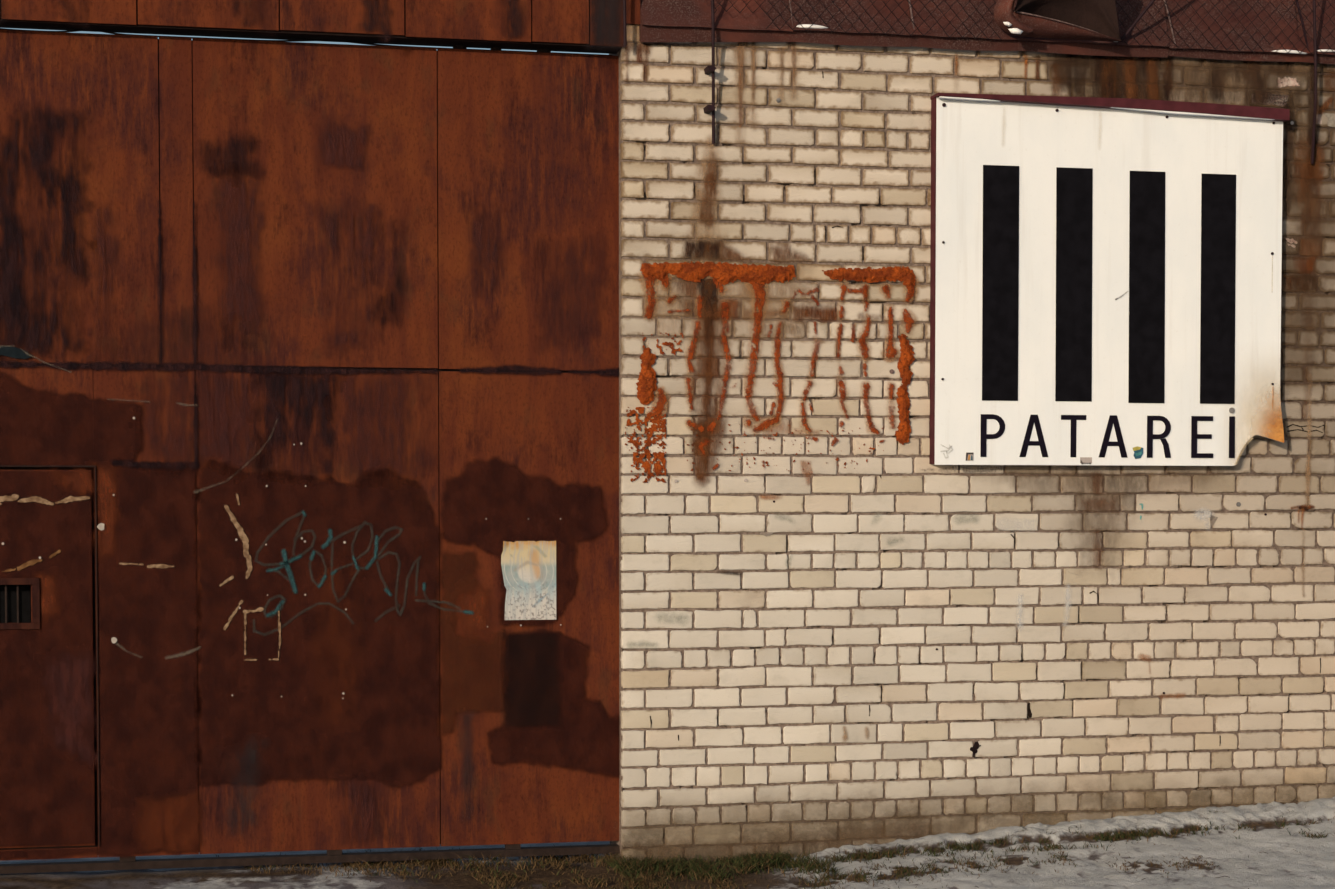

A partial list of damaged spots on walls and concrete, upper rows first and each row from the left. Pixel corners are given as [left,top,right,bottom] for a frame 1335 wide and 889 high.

rust [1024,54,1314,107]
rust [0,111,90,355]
rust [1282,140,1324,290]
rust [625,141,917,483]
rust [54,469,116,554]
rust [1291,456,1314,519]
rust [37,574,56,615]